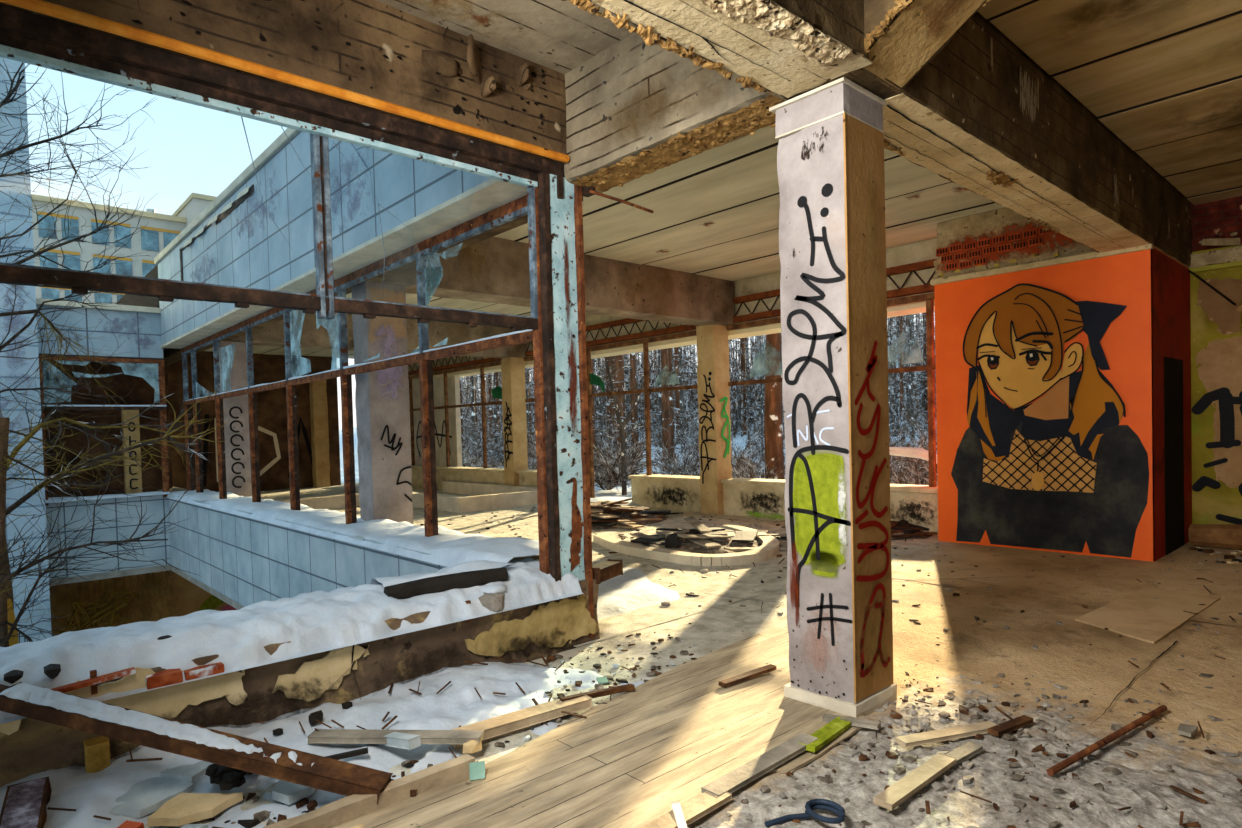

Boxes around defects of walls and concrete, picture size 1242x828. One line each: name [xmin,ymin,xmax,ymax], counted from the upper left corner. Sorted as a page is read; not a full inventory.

spalling [701,0,912,70]
spalling [560,0,785,192]
flaking render [934,217,1060,278]
flaking render [1199,232,1242,246]
corrosion [564,239,577,432]
peeling [1195,278,1242,488]
peeling [65,662,247,719]
peeling [272,645,370,702]
peeling [0,719,21,735]